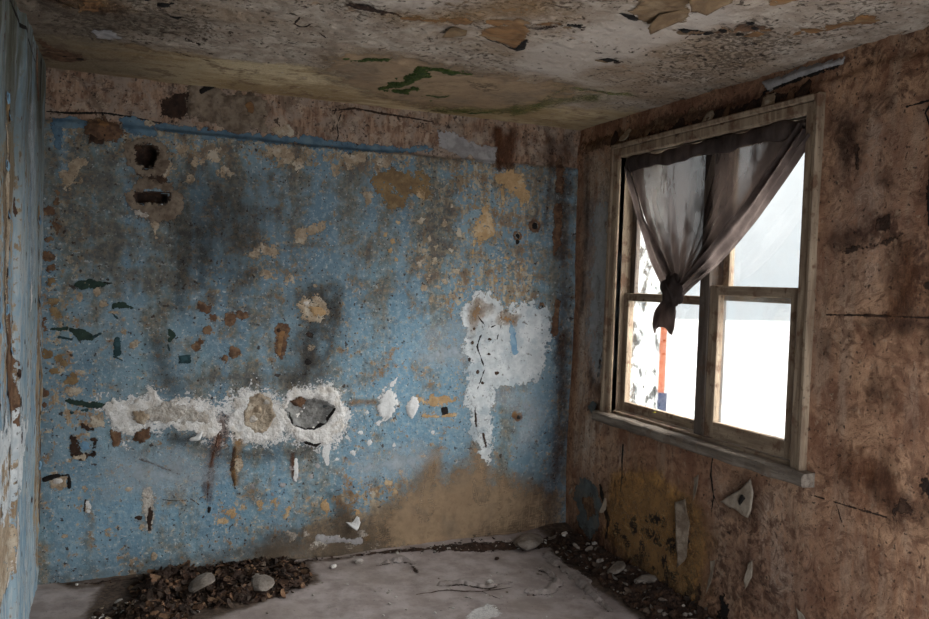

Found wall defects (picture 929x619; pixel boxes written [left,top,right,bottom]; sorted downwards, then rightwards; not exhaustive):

flaking render [479,25,558,51]
peeling [619,0,733,35]
damp [323,51,576,110]
crack [906,100,929,125]
flaking render [50,85,530,225]
peeling [441,205,496,258]
peeling [416,235,461,305]
flaking render [0,91,404,607]
flaking render [459,278,555,466]
damp [245,447,552,560]